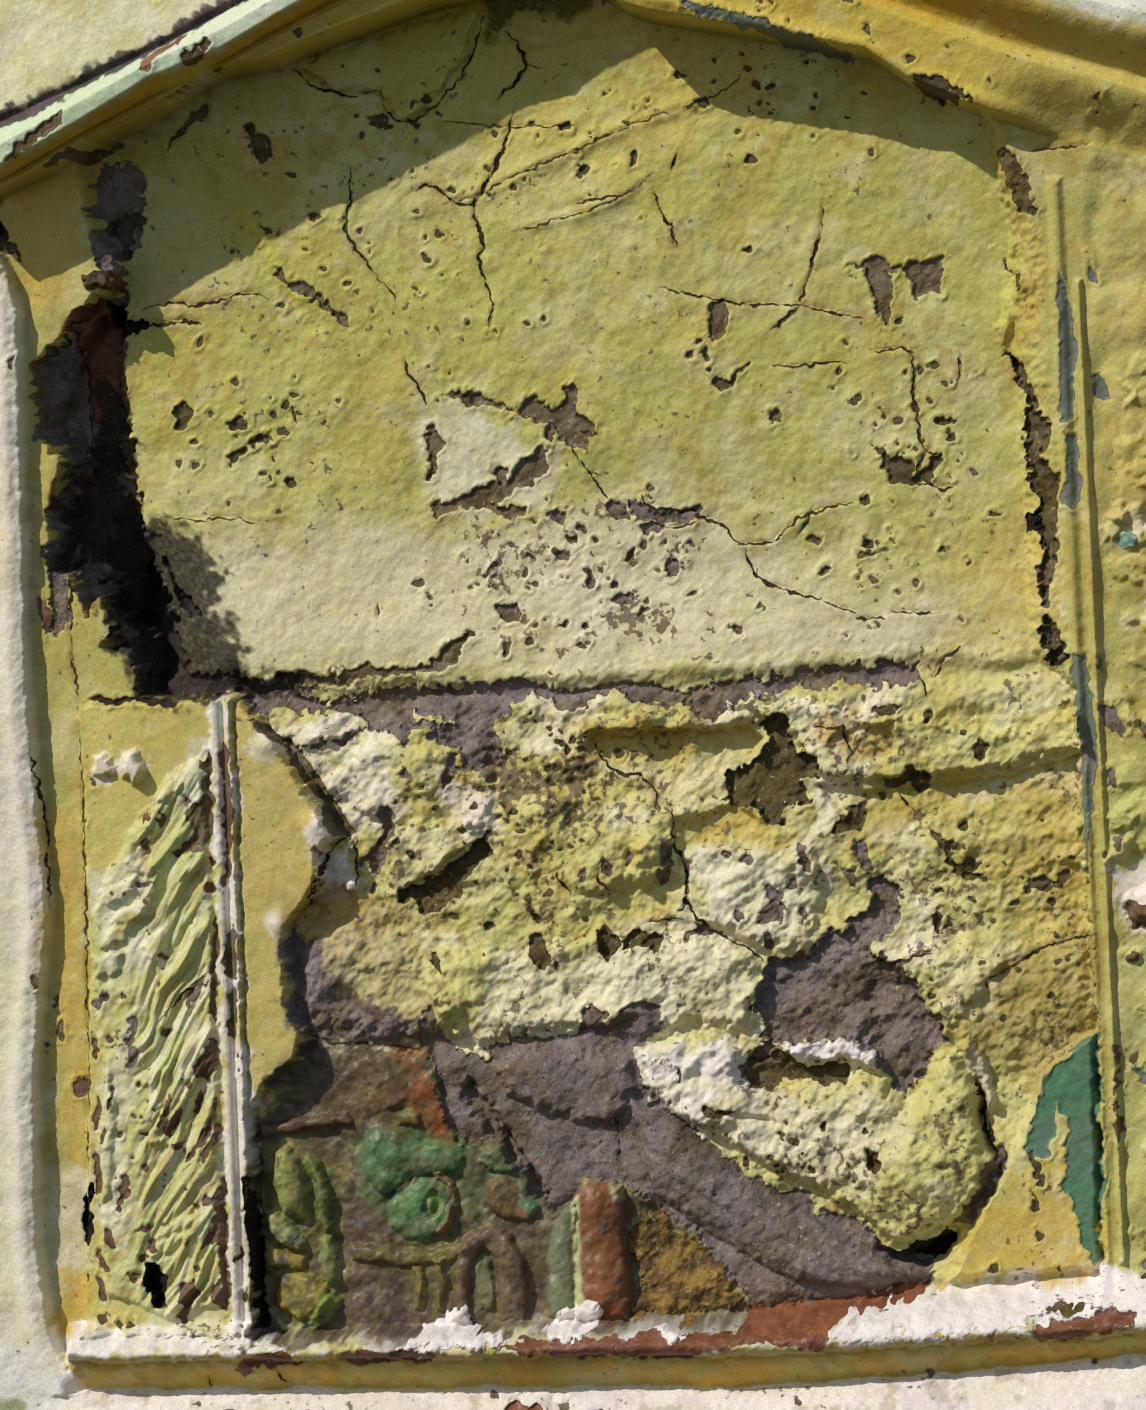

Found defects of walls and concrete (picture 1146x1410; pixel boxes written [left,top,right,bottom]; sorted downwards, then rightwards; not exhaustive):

crack [404,361,426,404]
peeling [7,142,920,970]
crack [289,3,745,327]
crack [571,447,940,621]
crack [662,207,863,329]
crack [772,346,953,492]
crack [918,645,961,696]
spalling [1003,352,1070,666]
peeling [91,916,240,1164]
peeling [176,1177,248,1324]
spalling [275,928,1008,1360]
spalling [733,764,950,1099]